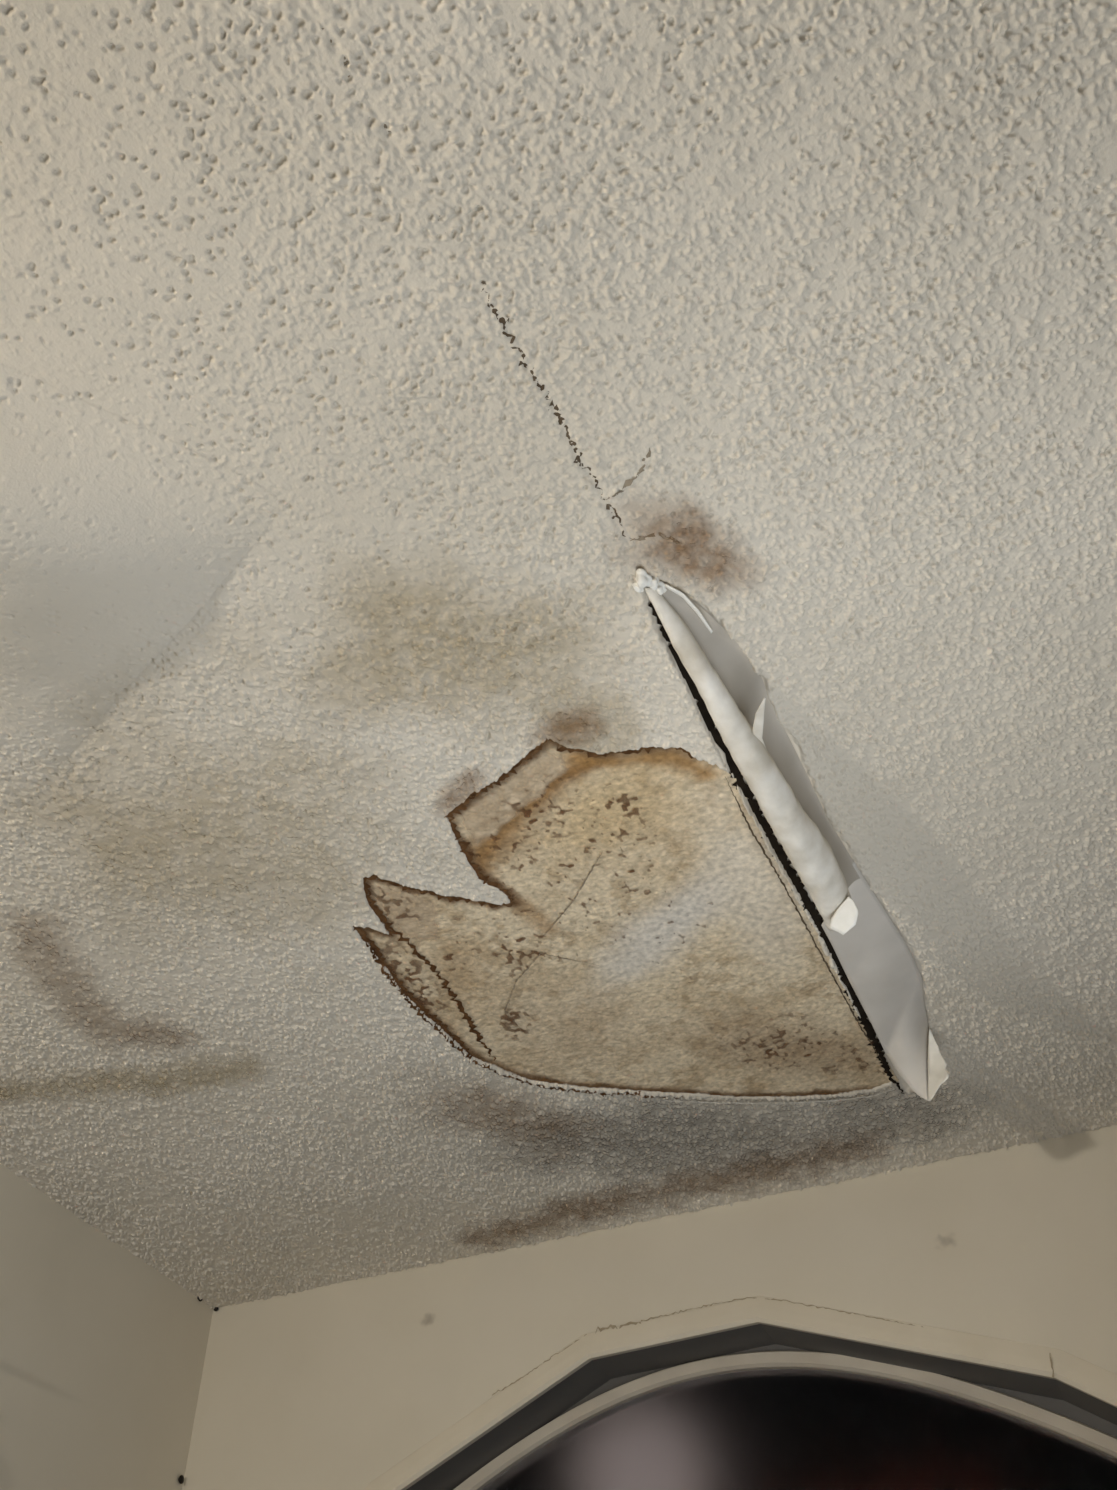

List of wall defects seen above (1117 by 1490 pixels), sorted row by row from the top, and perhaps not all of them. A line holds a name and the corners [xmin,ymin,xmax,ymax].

peeling [752,698,768,752]
peeling [353,738,899,1104]